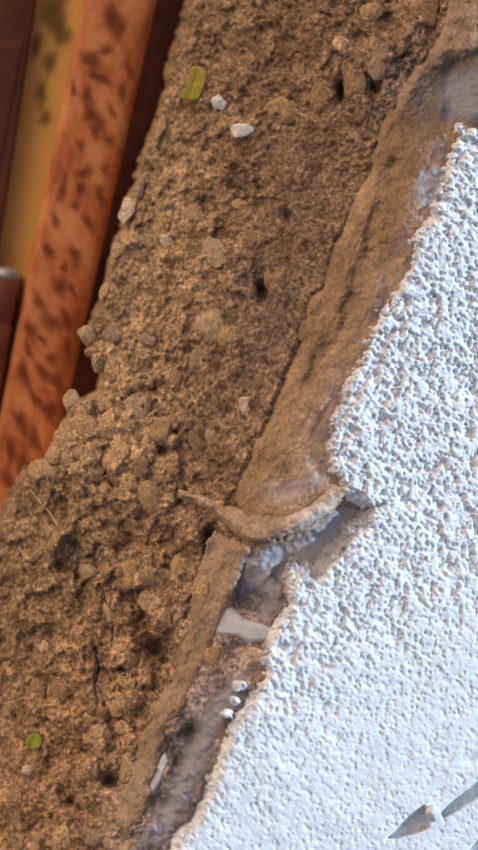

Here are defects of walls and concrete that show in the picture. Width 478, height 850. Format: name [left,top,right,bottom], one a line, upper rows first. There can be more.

spalling [231,123,254,137]
spalling [118,197,136,224]
peeling [236,0,478,518]
spalling [195,308,225,345]
spalling [59,410,99,441]
spalling [149,416,172,443]
spalling [112,440,131,460]
peeling [178,485,349,544]
peeling [271,506,373,590]
peeling [113,530,289,832]
spalling [386,781,478,839]
spalling [52,821,71,850]